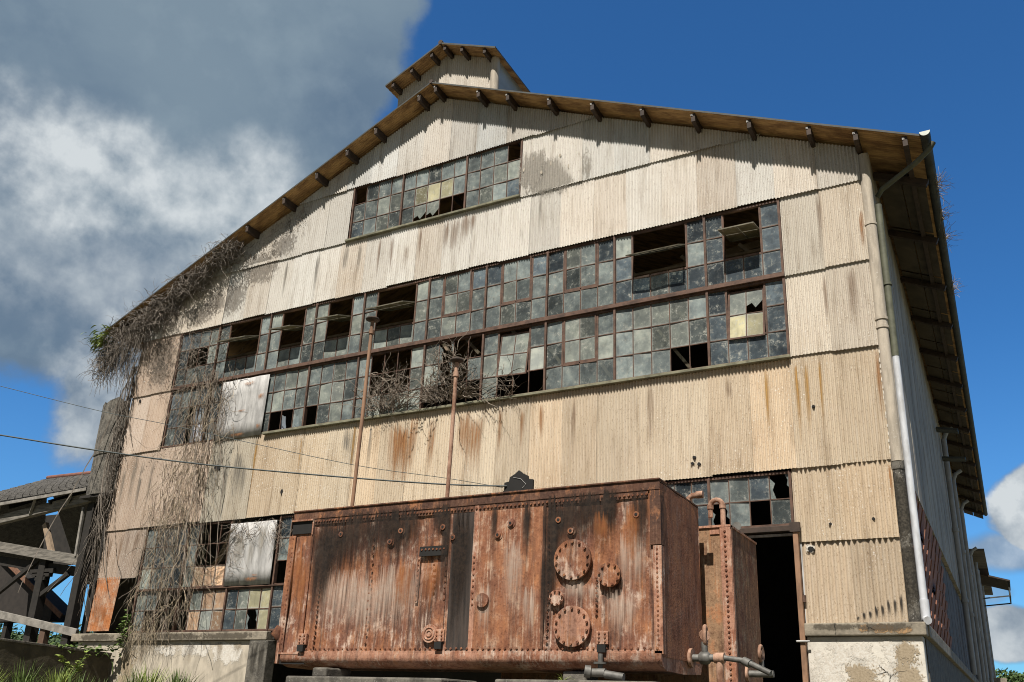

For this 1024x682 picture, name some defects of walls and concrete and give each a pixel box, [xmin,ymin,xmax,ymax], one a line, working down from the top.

corrosion [392,422,415,470]
corrosion [87,577,120,631]
spalling [811,623,926,682]